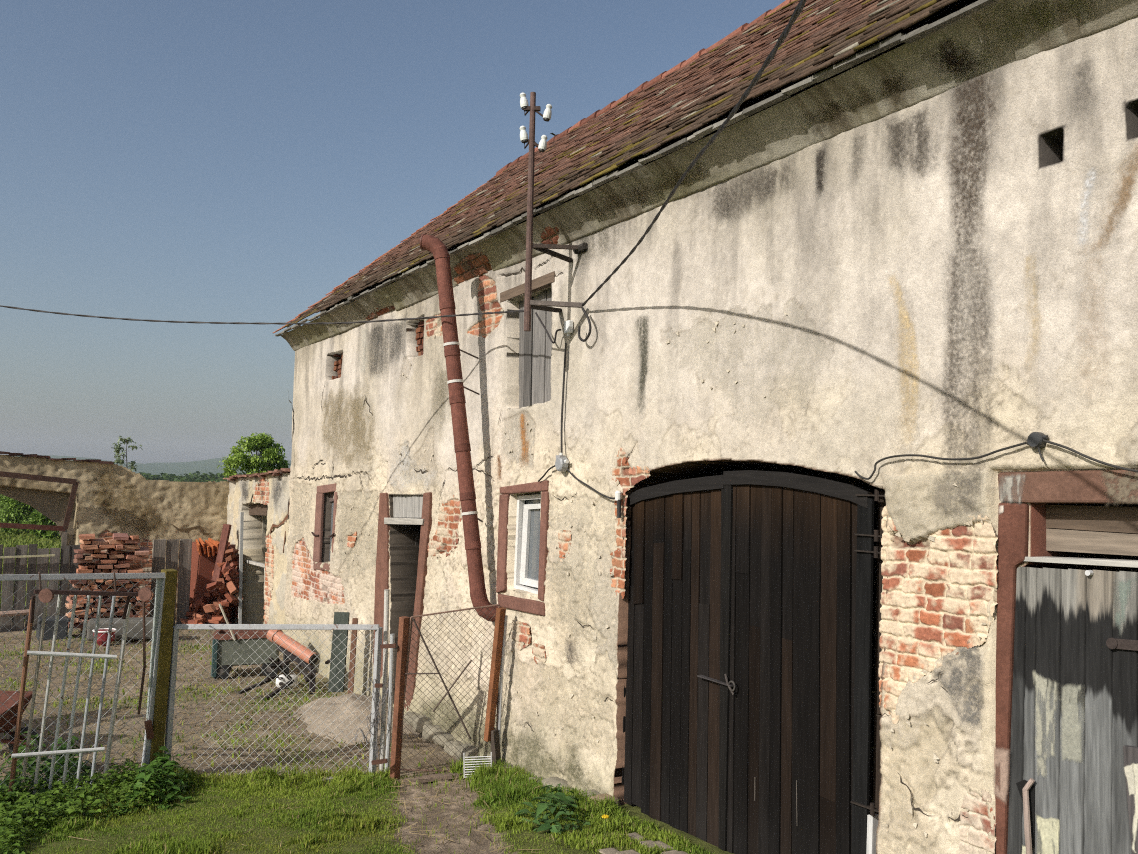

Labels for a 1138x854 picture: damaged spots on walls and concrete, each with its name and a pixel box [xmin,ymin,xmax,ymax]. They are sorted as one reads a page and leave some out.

damp [891,113,925,168]
damp [938,41,994,226]
spalling [426,313,443,340]
spalling [453,252,503,338]
spalling [291,486,376,604]
spalling [428,495,461,558]
spalling [548,448,650,666]
spalling [878,475,1025,821]